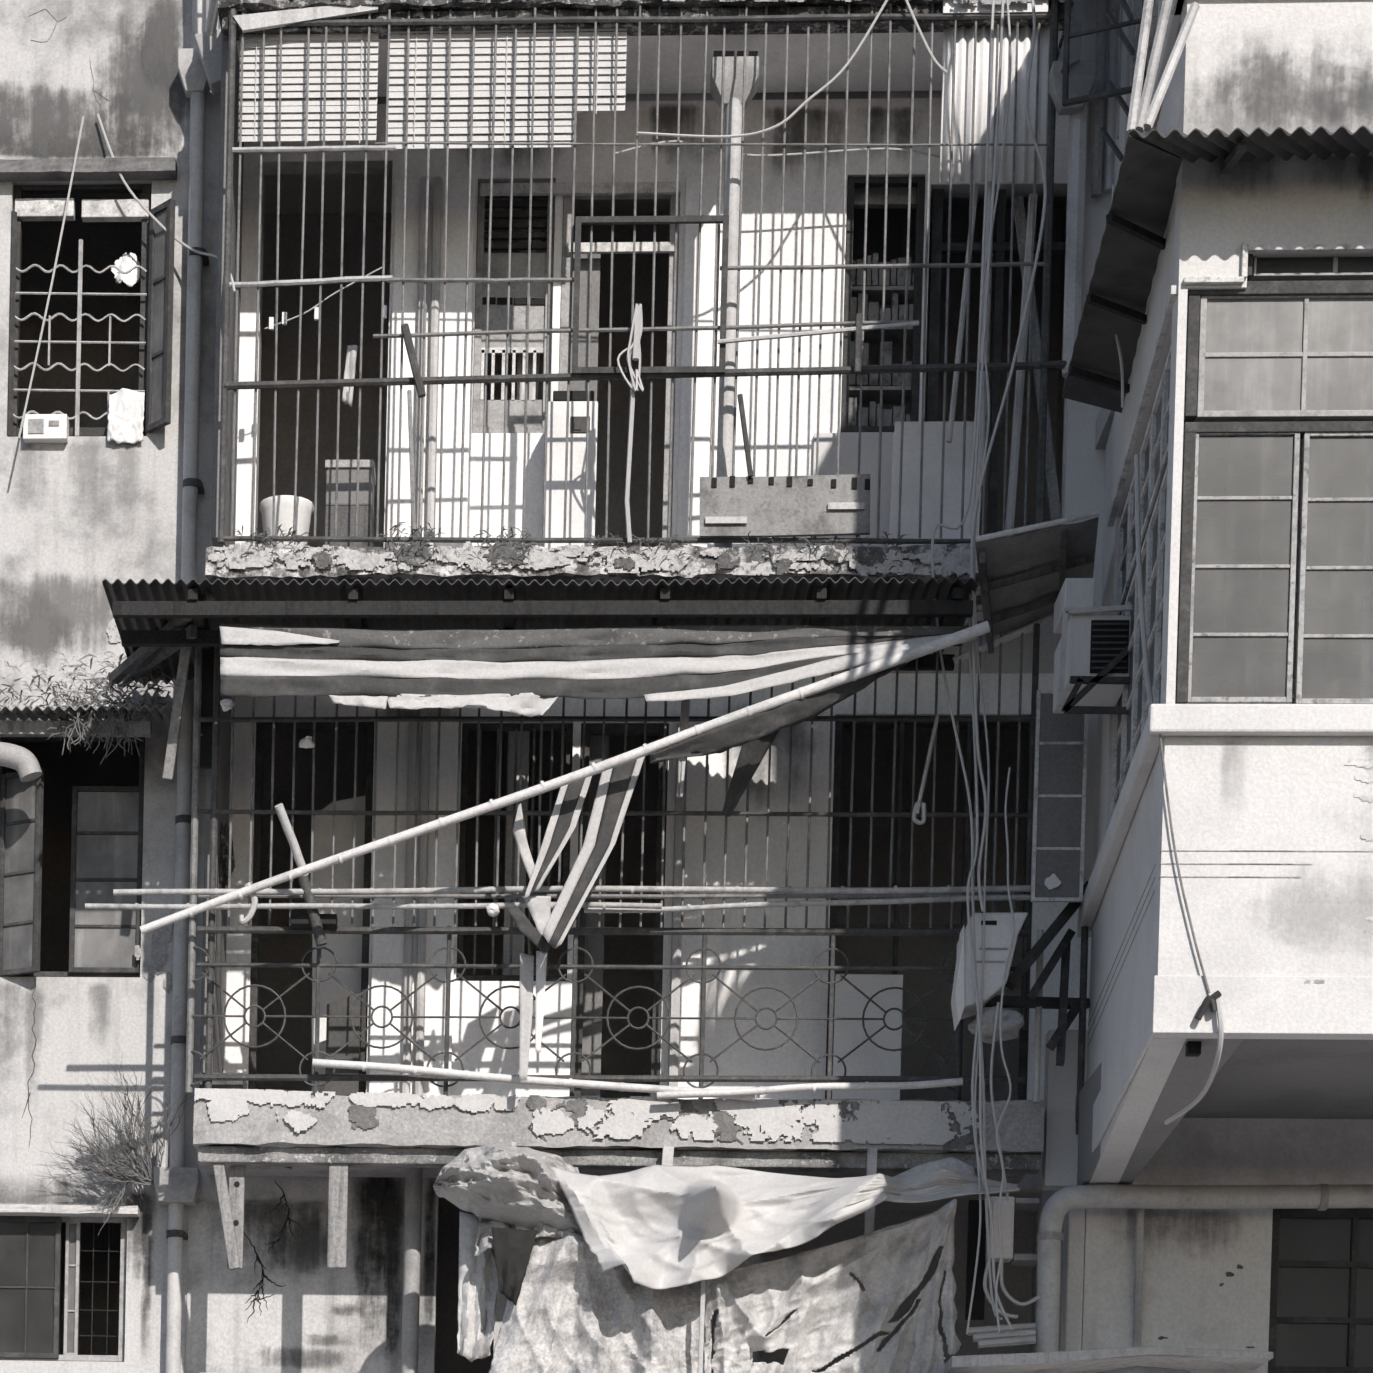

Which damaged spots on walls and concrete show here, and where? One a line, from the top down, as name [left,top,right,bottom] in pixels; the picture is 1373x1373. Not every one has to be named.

leakage [0,2,191,159]
peeling [208,541,978,577]
crack [22,984,36,1145]
peeling [194,1088,983,1151]
leakage [336,1177,402,1350]
leakage [424,1181,435,1317]
leakage [277,1336,339,1367]